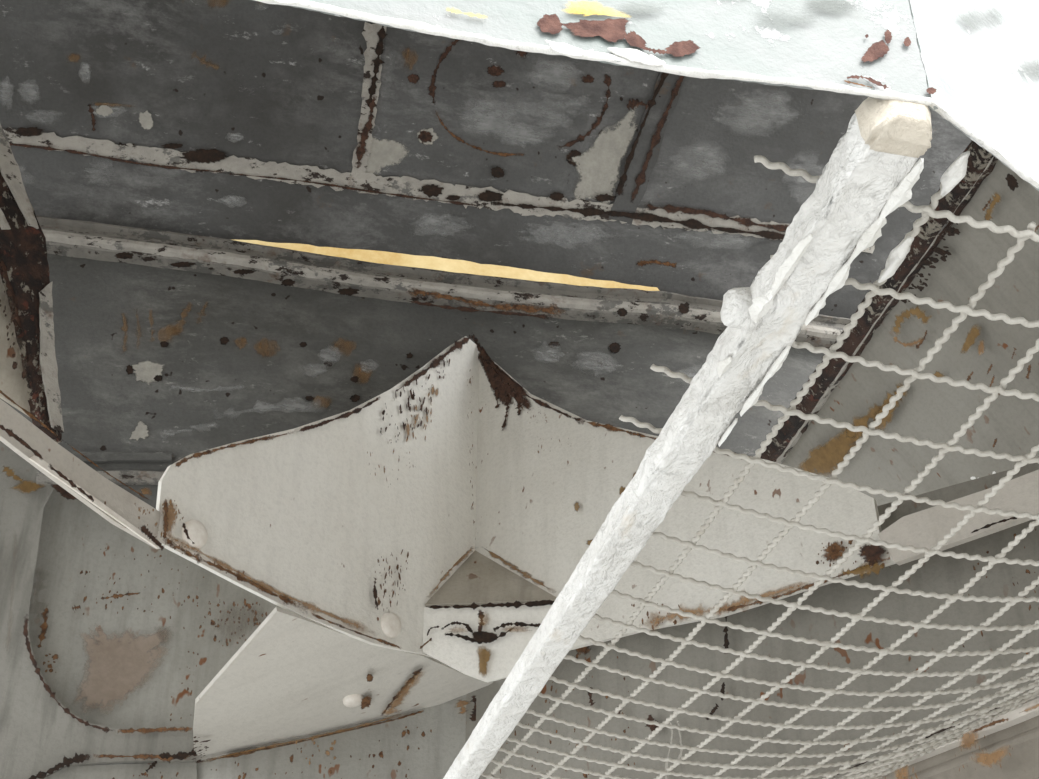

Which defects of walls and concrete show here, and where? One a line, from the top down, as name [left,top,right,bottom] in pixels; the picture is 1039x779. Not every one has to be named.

rust [356,26,388,168]
peeling [365,137,409,174]
rust [10,72,789,240]
rust [406,39,524,178]
peeling [572,106,637,205]
rust [1005,174,1018,191]
rust [0,252,28,379]
rust [901,223,960,303]
rust [176,334,656,485]
rust [641,540,890,630]
rust [23,608,432,779]